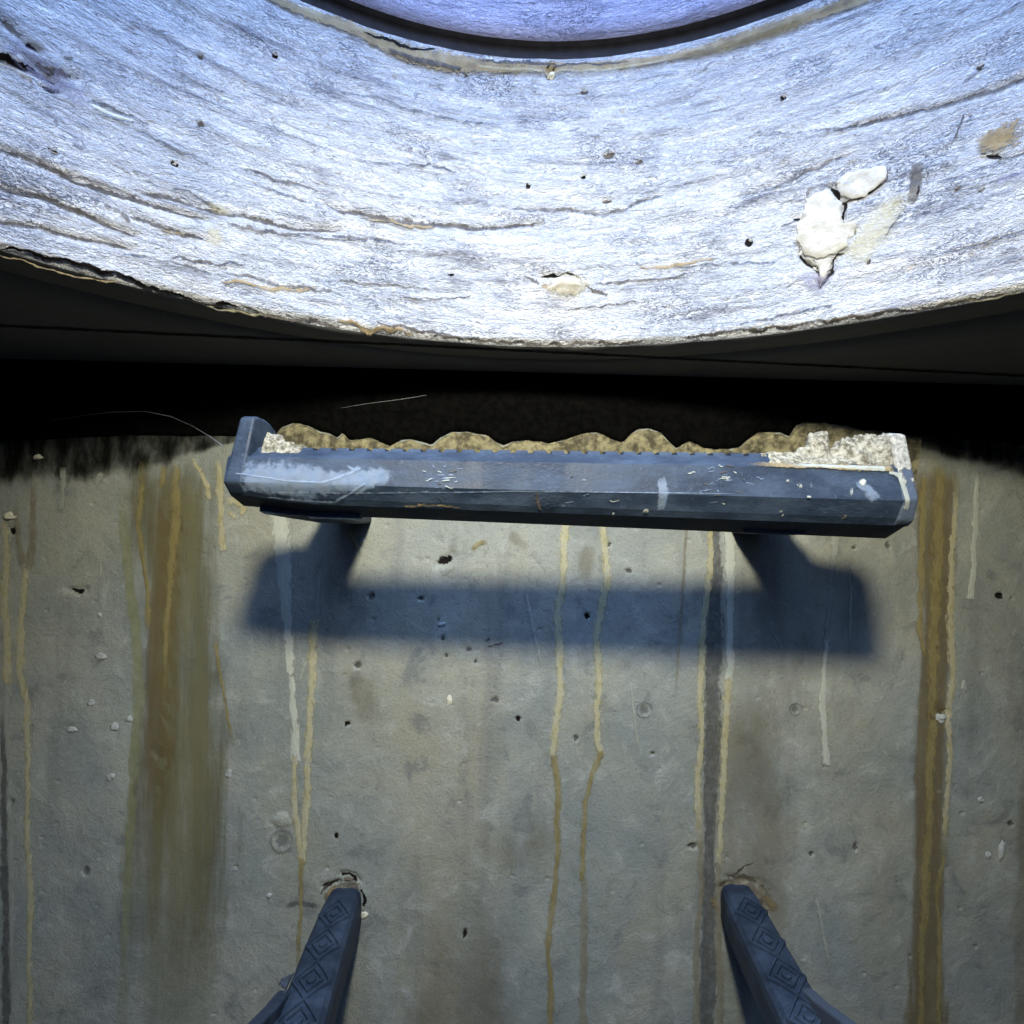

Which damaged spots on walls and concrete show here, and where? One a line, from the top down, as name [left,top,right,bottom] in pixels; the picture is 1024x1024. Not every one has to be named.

spalling [0,246,646,348]
spalling [684,289,1022,338]
corrosion [123,467,223,939]
corrosion [907,471,959,1024]
spalling [321,872,368,919]
spalling [710,863,778,915]